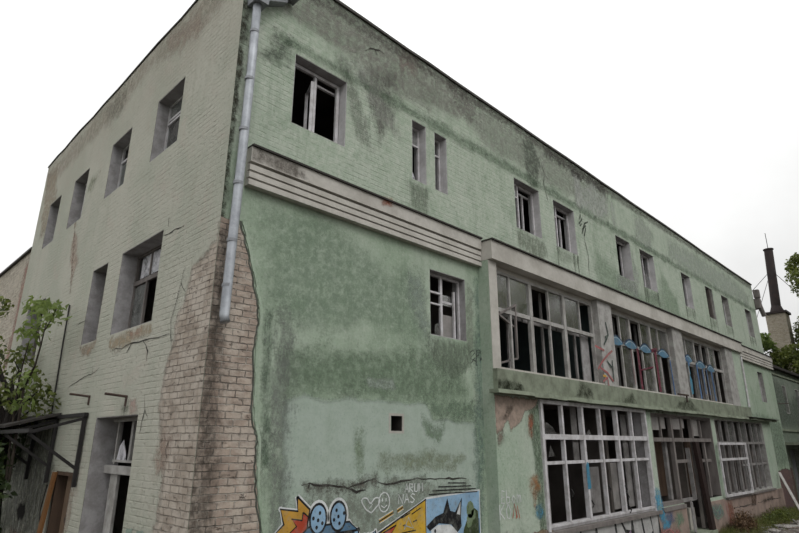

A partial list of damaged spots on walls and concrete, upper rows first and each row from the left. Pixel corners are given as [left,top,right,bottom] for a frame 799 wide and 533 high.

water stain [286,0,508,141]
water stain [461,136,755,312]
crack [115,275,185,359]
flaking render [153,217,266,533]
water stain [261,284,484,533]
crack [302,476,466,494]
flaking render [494,394,537,445]